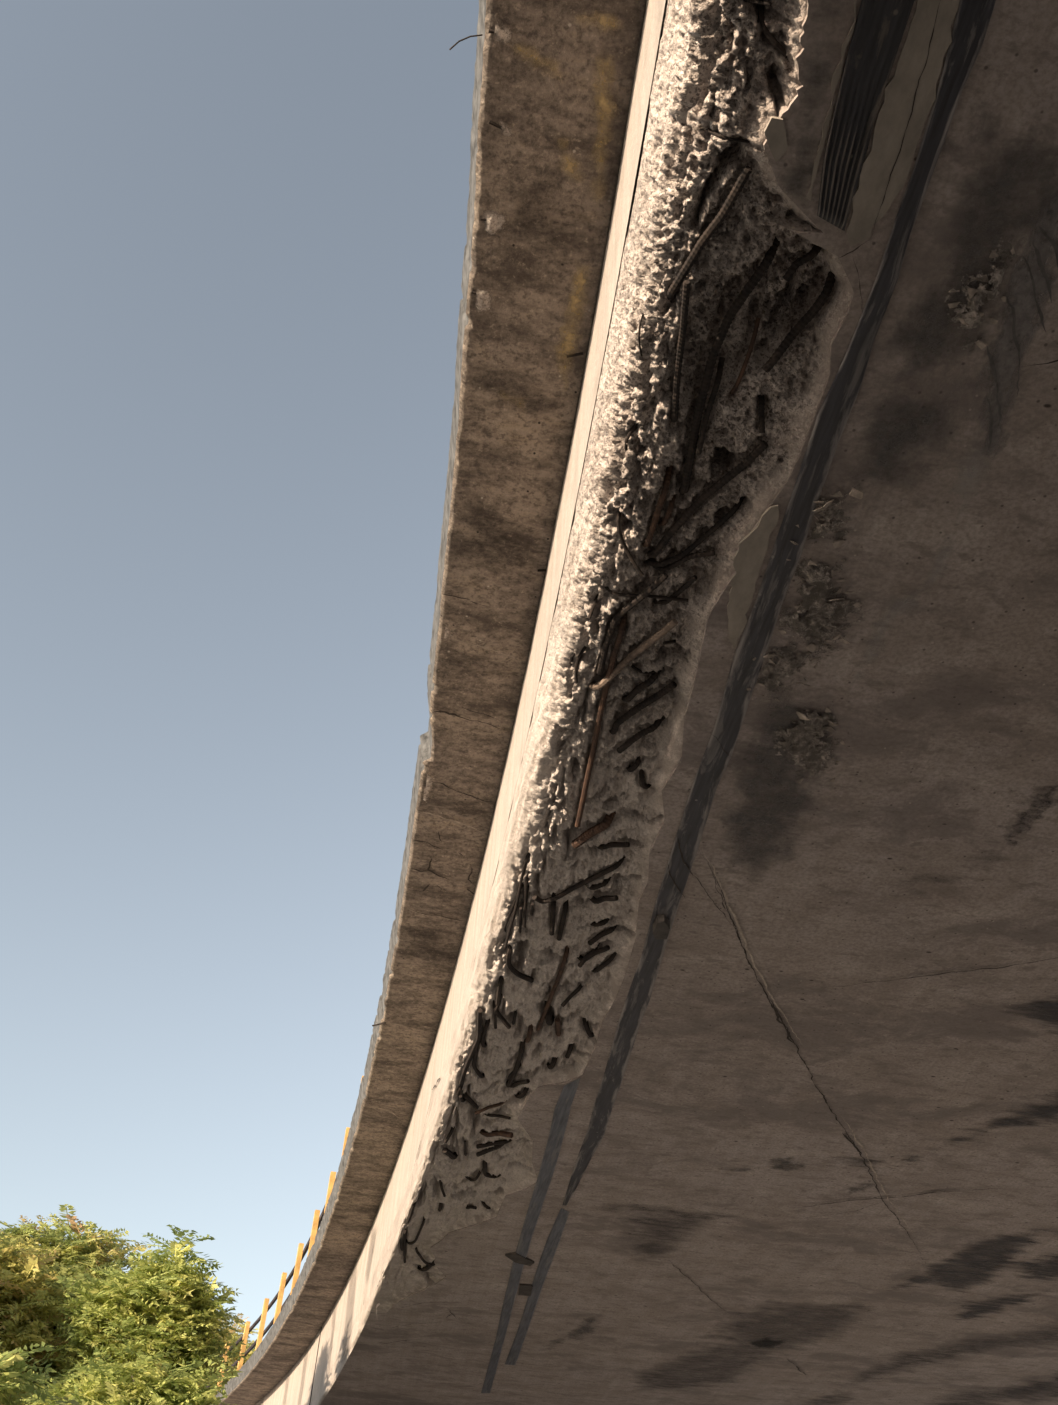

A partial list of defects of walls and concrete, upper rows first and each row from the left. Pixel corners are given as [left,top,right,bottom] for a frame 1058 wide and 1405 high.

peeling [942,237,1017,351]
spalling [368,0,864,1313]
leakage [729,704,807,865]
crack [667,837,996,1263]
leakage [642,1307,855,1388]
leakage [960,1296,1029,1319]